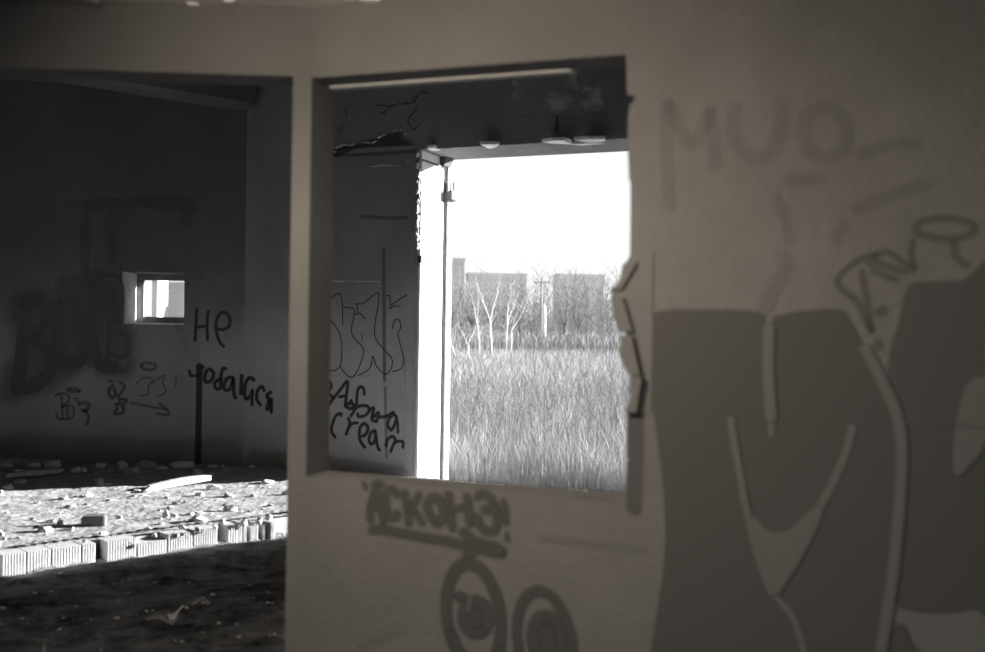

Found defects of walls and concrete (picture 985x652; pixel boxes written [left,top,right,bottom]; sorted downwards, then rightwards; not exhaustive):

crack [375,91,427,132]
spalling [333,130,440,469]
spalling [611,253,654,414]